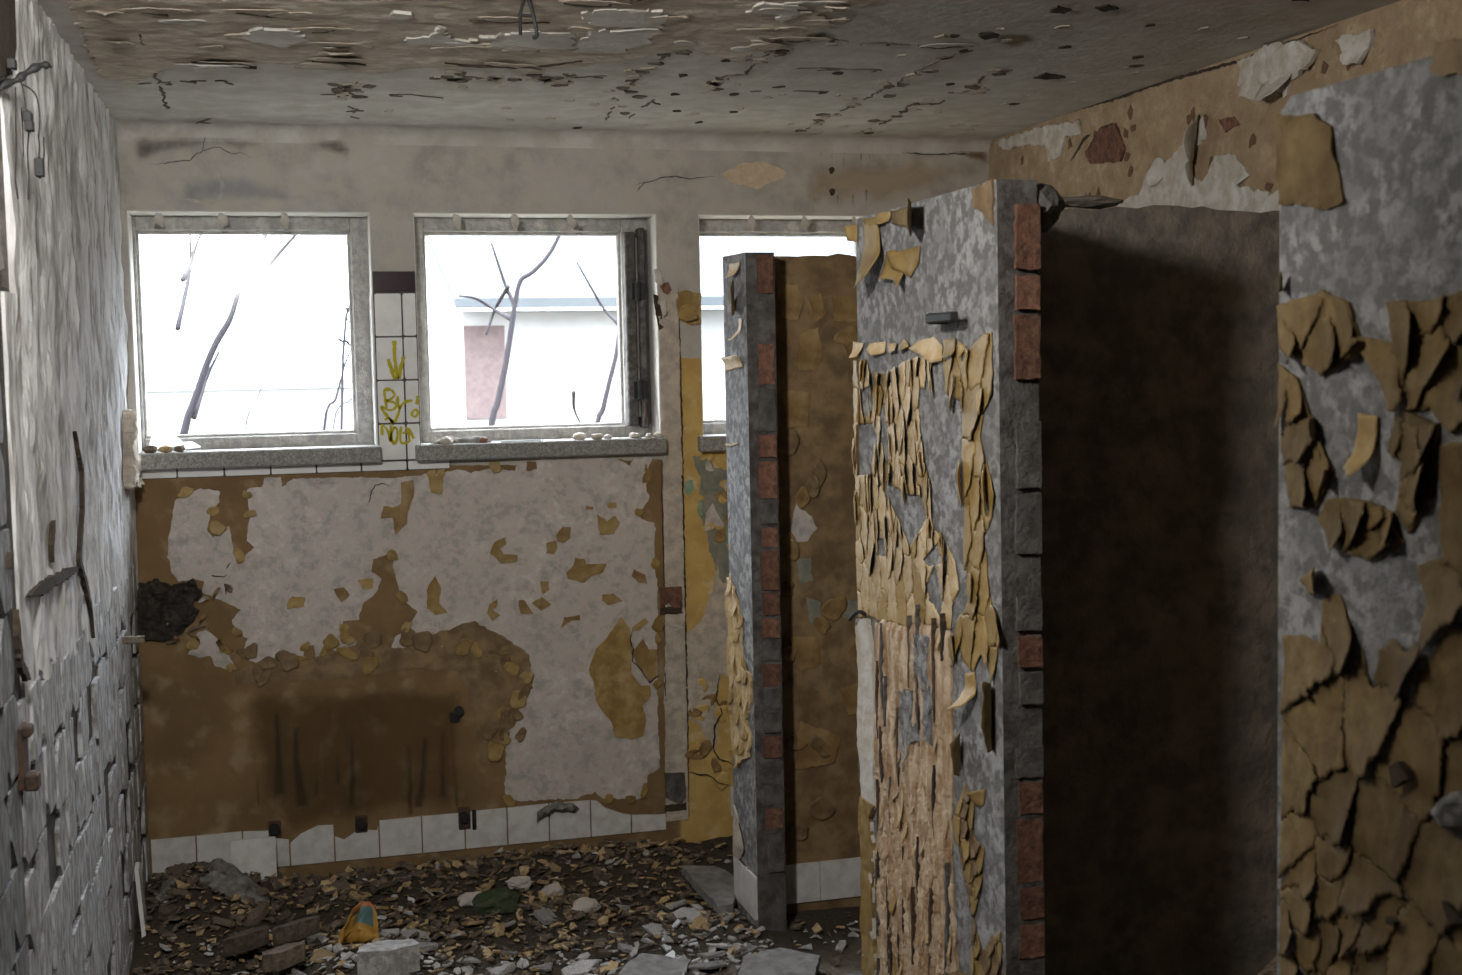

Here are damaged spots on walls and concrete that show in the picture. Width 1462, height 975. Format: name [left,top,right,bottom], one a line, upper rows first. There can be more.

peeling [972,178,995,226]
peeling [995,29,1374,213]
peeling [137,455,663,807]
flaking render [733,805,744,860]
flaking render [684,255,821,791]
flaking render [764,784,784,873]
flaking render [843,332,1045,975]
peeling [1273,271,1462,975]